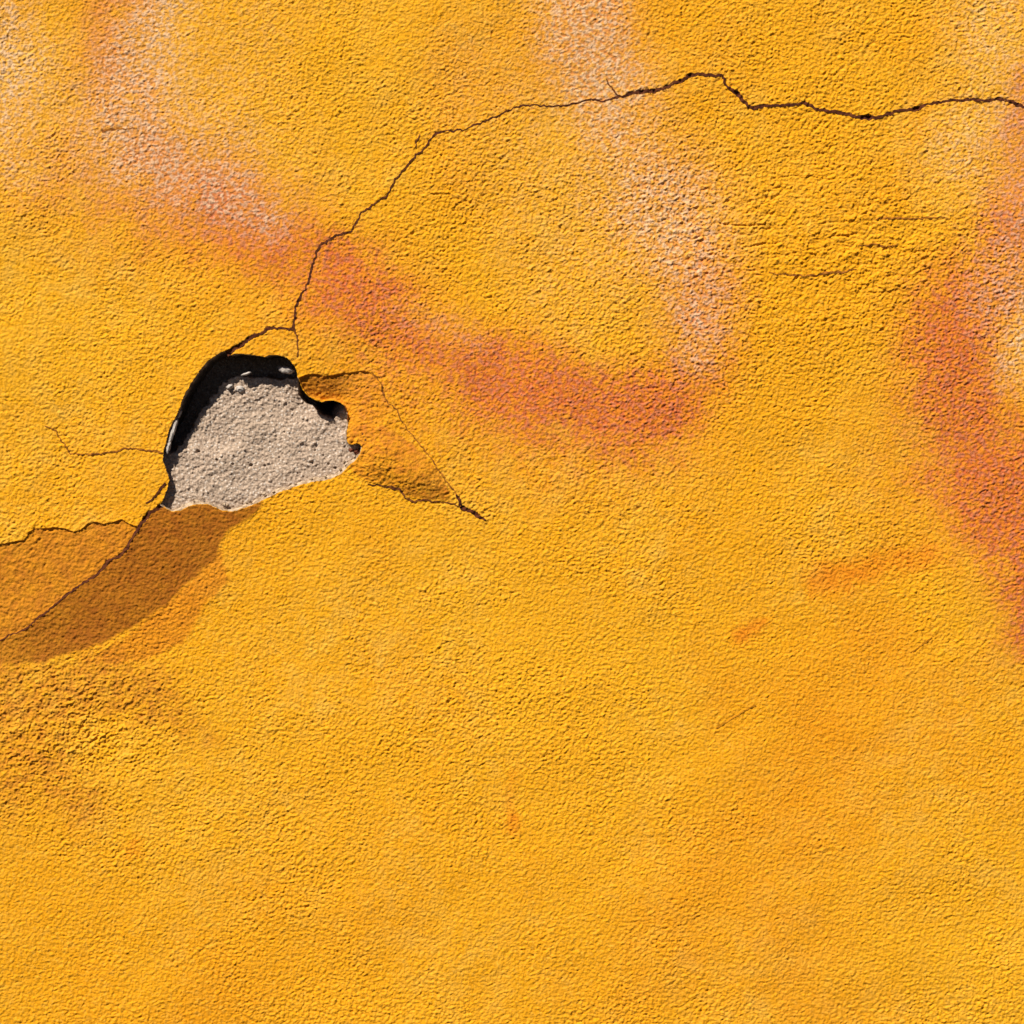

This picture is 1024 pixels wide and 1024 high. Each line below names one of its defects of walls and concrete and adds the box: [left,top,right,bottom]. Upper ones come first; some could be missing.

crack [101,126,136,134]
crack [225,72,1024,357]
crack [45,426,163,456]
spalling [160,351,366,511]
crack [369,372,486,521]
crack [0,482,166,641]